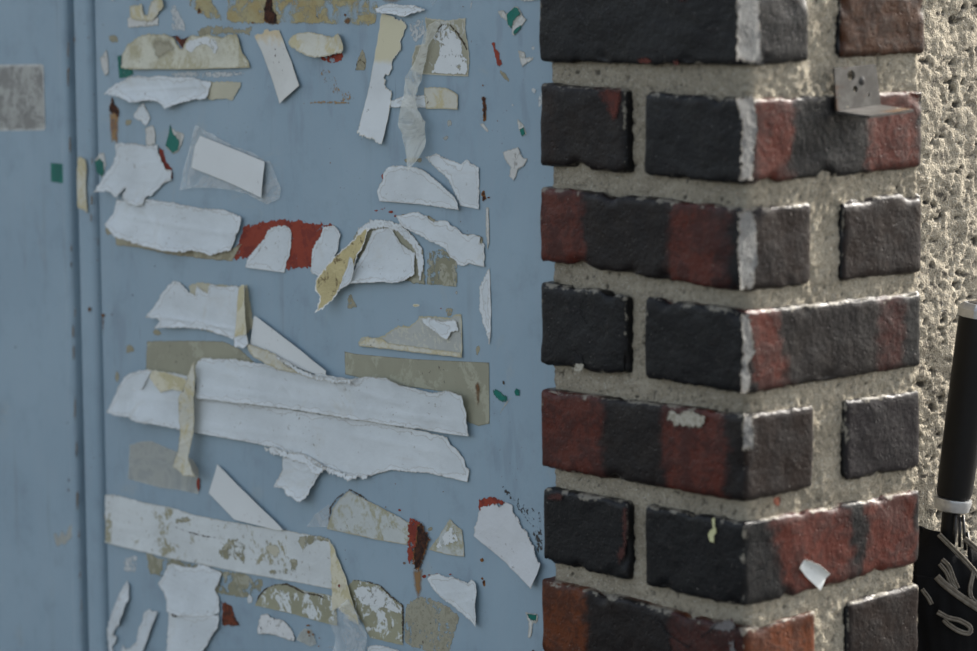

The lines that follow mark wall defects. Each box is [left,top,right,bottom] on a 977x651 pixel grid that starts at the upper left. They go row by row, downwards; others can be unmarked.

corrosion [252,0,278,24]
peeling [478,497,505,510]
corrosion [403,518,432,595]